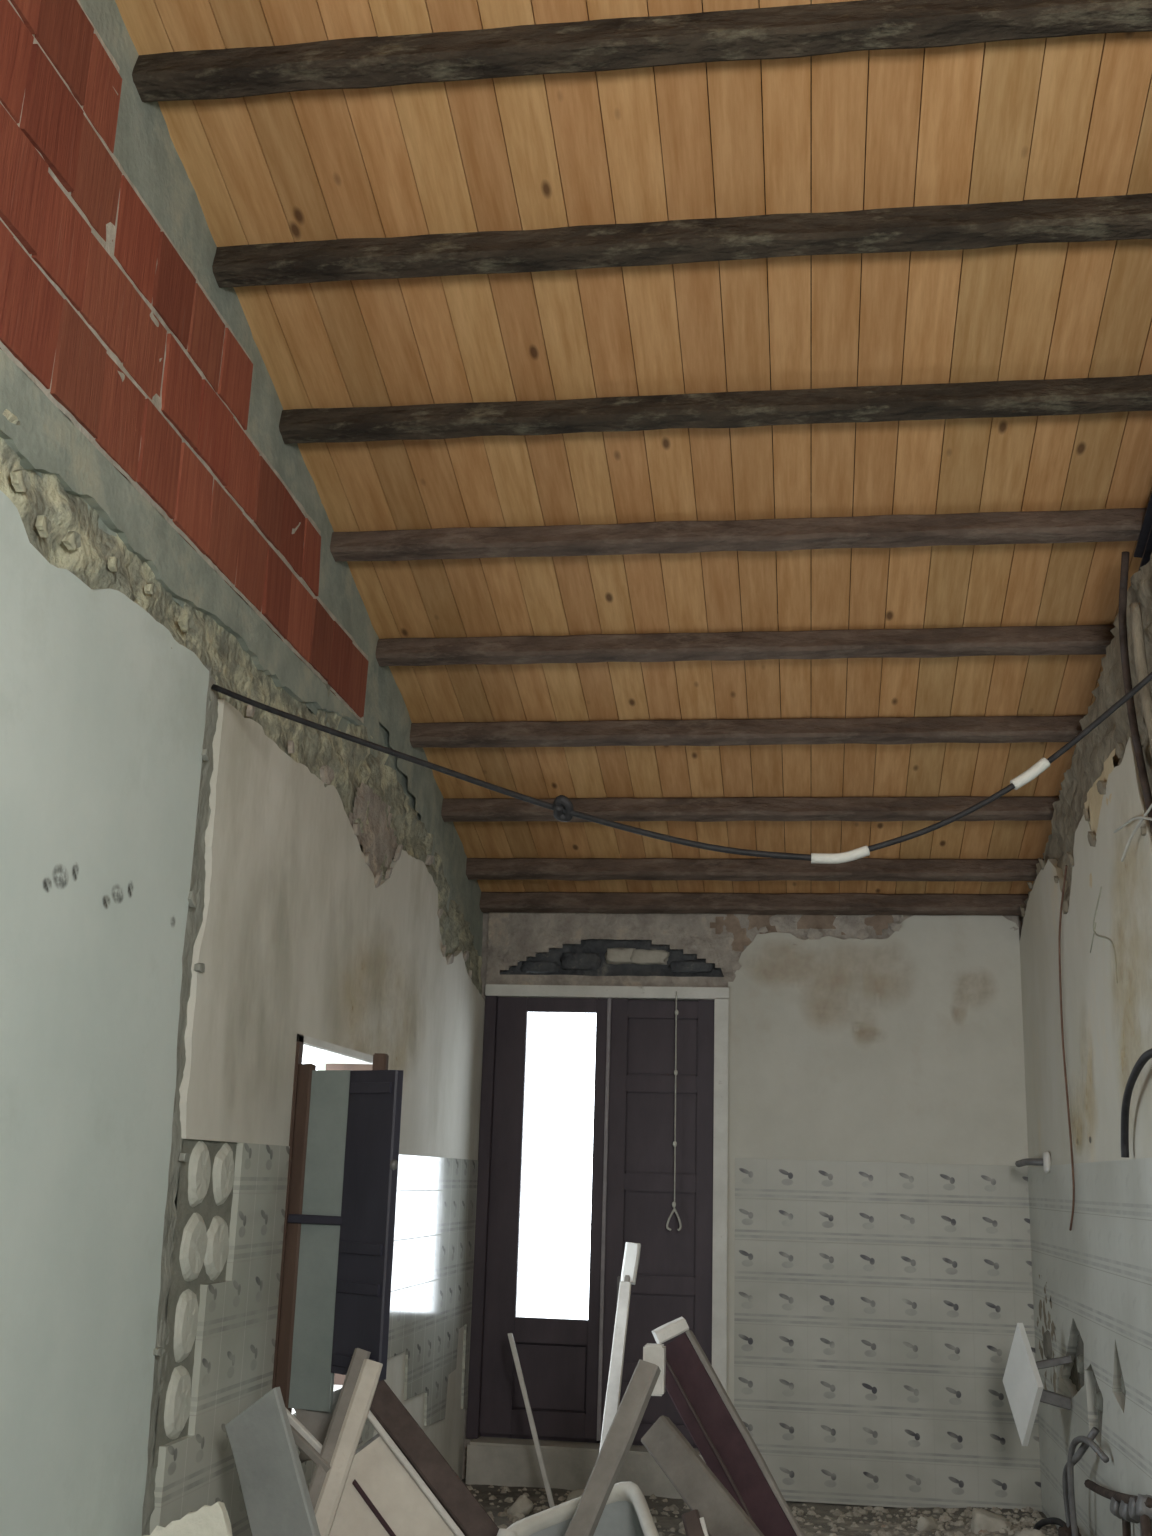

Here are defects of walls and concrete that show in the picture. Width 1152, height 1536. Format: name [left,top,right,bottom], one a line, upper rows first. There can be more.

spalling [0,349,914,995]
spalling [1004,553,1152,931]
peeling [1037,1275,1103,1434]